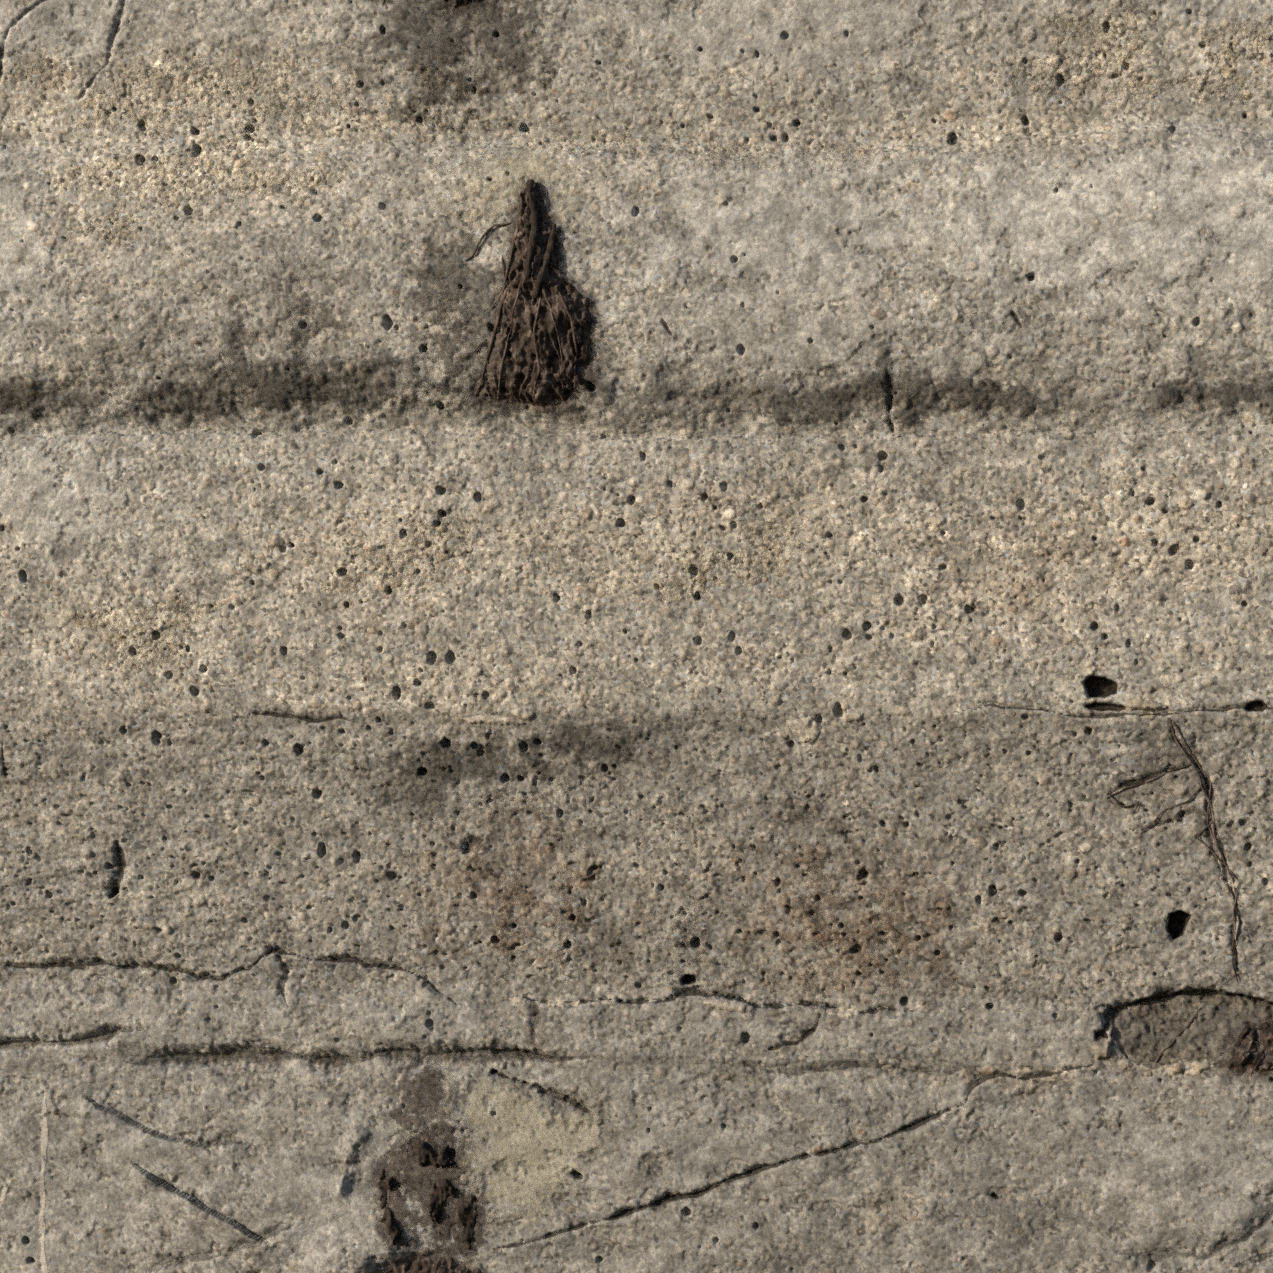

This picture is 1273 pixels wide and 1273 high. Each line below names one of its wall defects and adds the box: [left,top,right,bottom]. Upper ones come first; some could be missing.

crack [77,0,125,100]
water stain [375,0,547,123]
water stain [440,143,580,224]
water stain [409,231,506,411]
crack [0,742,8,778]
crack [108,840,126,899]
crack [954,703,1273,1031]
crack [0,949,456,1007]
crack [509,989,913,1052]
spalling [1111,990,1273,1069]
crack [493,1064,1093,1250]
crack [1104,1217,1273,1266]